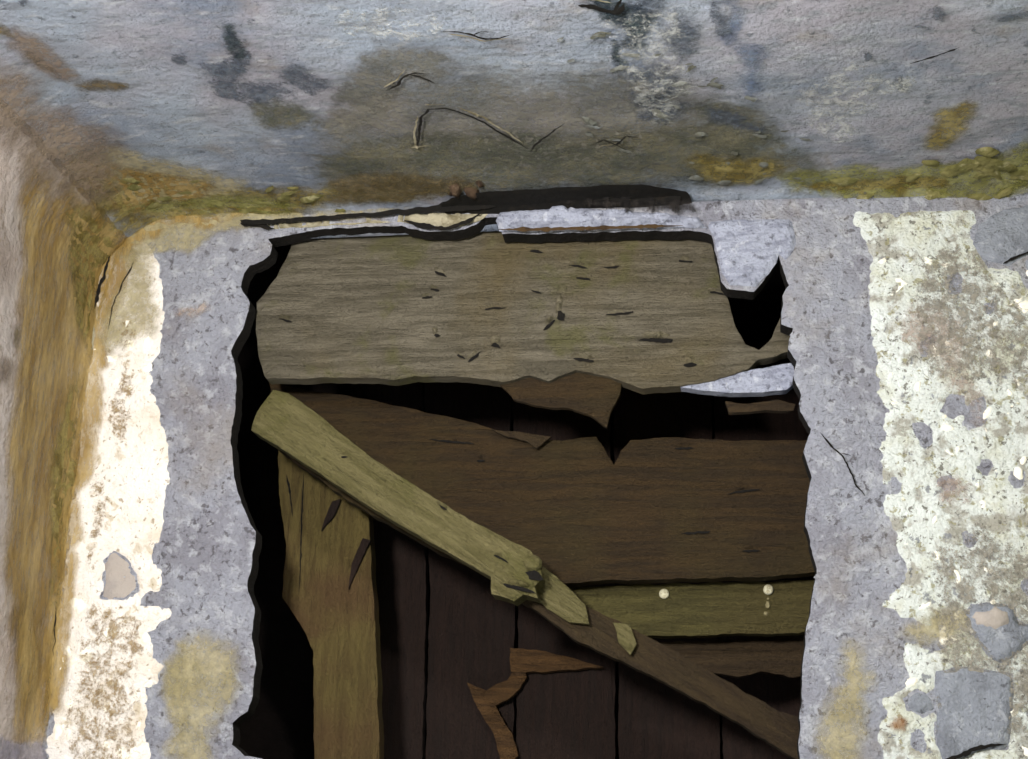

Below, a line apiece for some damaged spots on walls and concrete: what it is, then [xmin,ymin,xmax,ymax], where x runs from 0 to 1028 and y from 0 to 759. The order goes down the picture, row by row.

leakage [0,26,127,91]
crack [384,70,562,152]
leakage [200,0,819,213]
peeling [671,63,723,89]
peeling [708,219,796,295]
crack [91,256,134,349]
leakage [0,74,156,743]
crack [822,435,865,496]
spalling [503,570,544,593]
leakage [166,636,236,759]